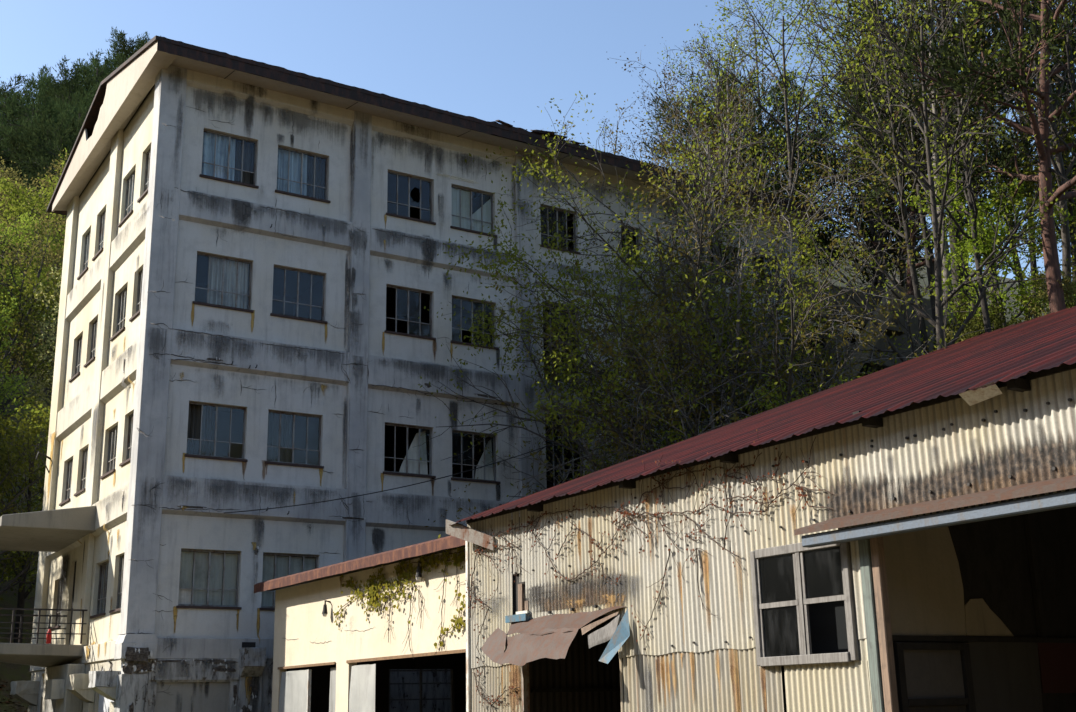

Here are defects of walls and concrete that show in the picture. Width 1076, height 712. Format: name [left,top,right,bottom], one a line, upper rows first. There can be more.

damp [196,83,322,146]
damp [821,432,1076,521]
corrosion [577,518,592,569]
damp [529,567,639,612]
spalling [101,648,258,712]
corrosion [655,653,694,700]
corrosion [715,648,741,712]